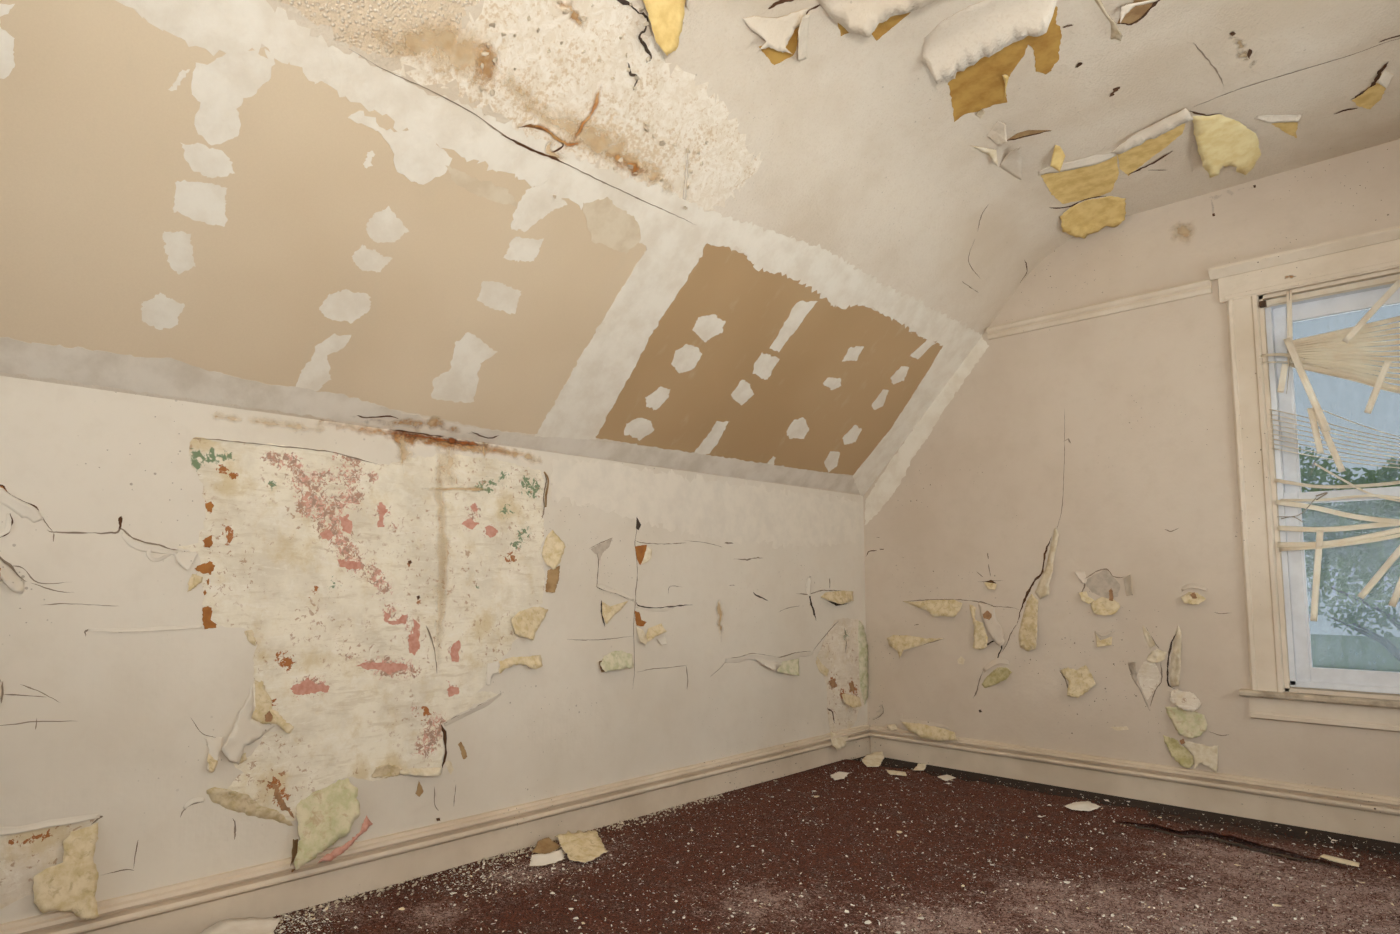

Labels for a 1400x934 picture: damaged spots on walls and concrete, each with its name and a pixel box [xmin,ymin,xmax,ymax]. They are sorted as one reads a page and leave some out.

water stain [407,31,494,80]
flaking render [391,0,763,212]
crack [0,719,66,730]
crack [0,484,202,636]
peeling [173,437,565,872]
peeling [591,538,667,672]
peeling [711,577,869,750]
peeling [903,527,1059,698]
peeling [1060,665,1096,698]
peeling [1074,568,1133,616]
peeling [1128,625,1226,773]
peeling [0,814,138,921]